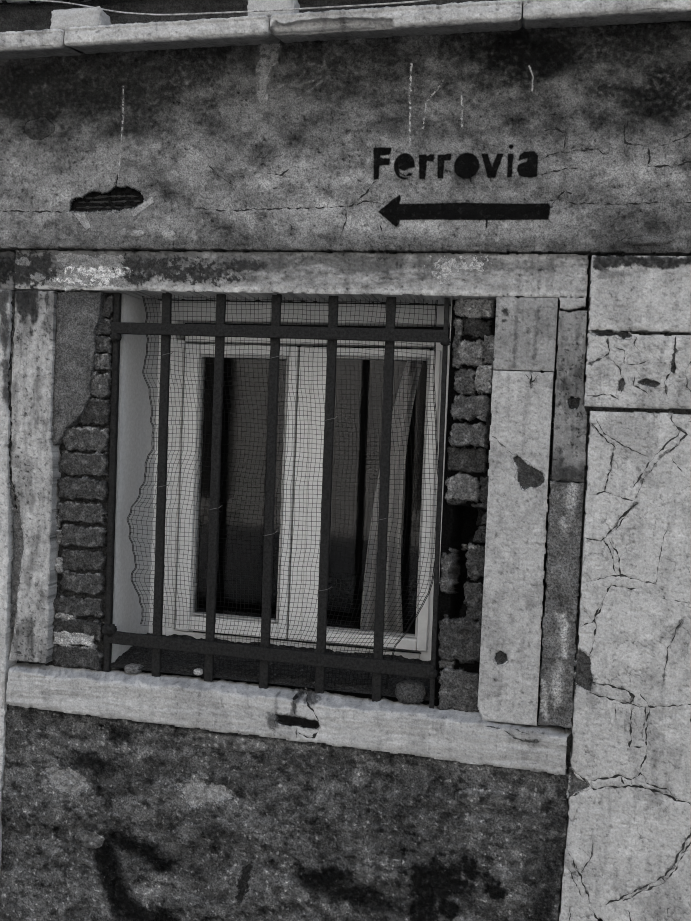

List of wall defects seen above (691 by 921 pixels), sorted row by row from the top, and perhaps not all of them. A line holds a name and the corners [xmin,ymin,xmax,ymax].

spalling [70,186,154,234]
flaking render [0,249,267,671]
flaking render [434,298,496,712]
spalling [513,456,545,490]
crack [582,337,691,678]
spalling [274,713,320,729]
crack [573,682,691,804]
crack [569,828,691,921]